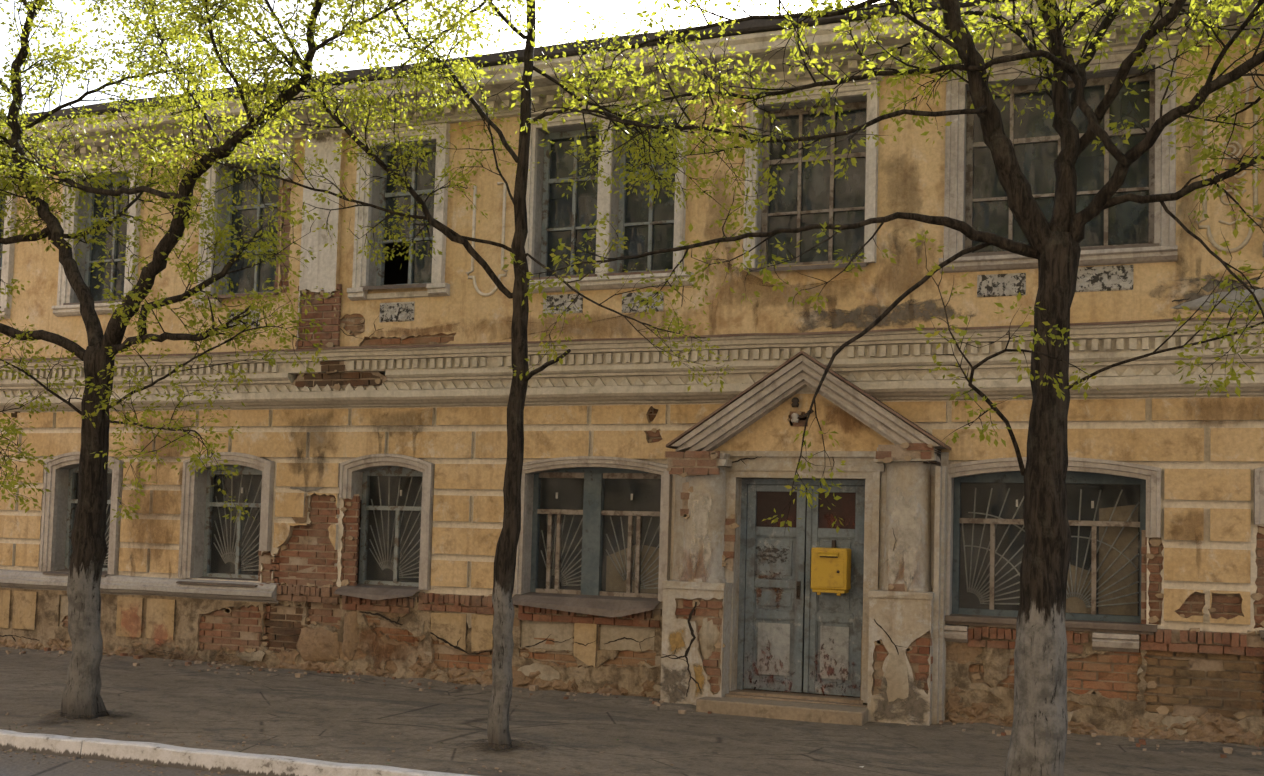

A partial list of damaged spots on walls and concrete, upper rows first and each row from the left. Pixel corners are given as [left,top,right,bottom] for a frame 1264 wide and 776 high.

flaking render [274,180,456,349]
flaking render [646,408,720,519]
flaking render [258,487,360,588]
flaking render [199,602,311,653]
crack [359,611,492,655]
crack [525,602,701,697]
crack [874,619,907,655]
flaking render [1067,525,1264,722]